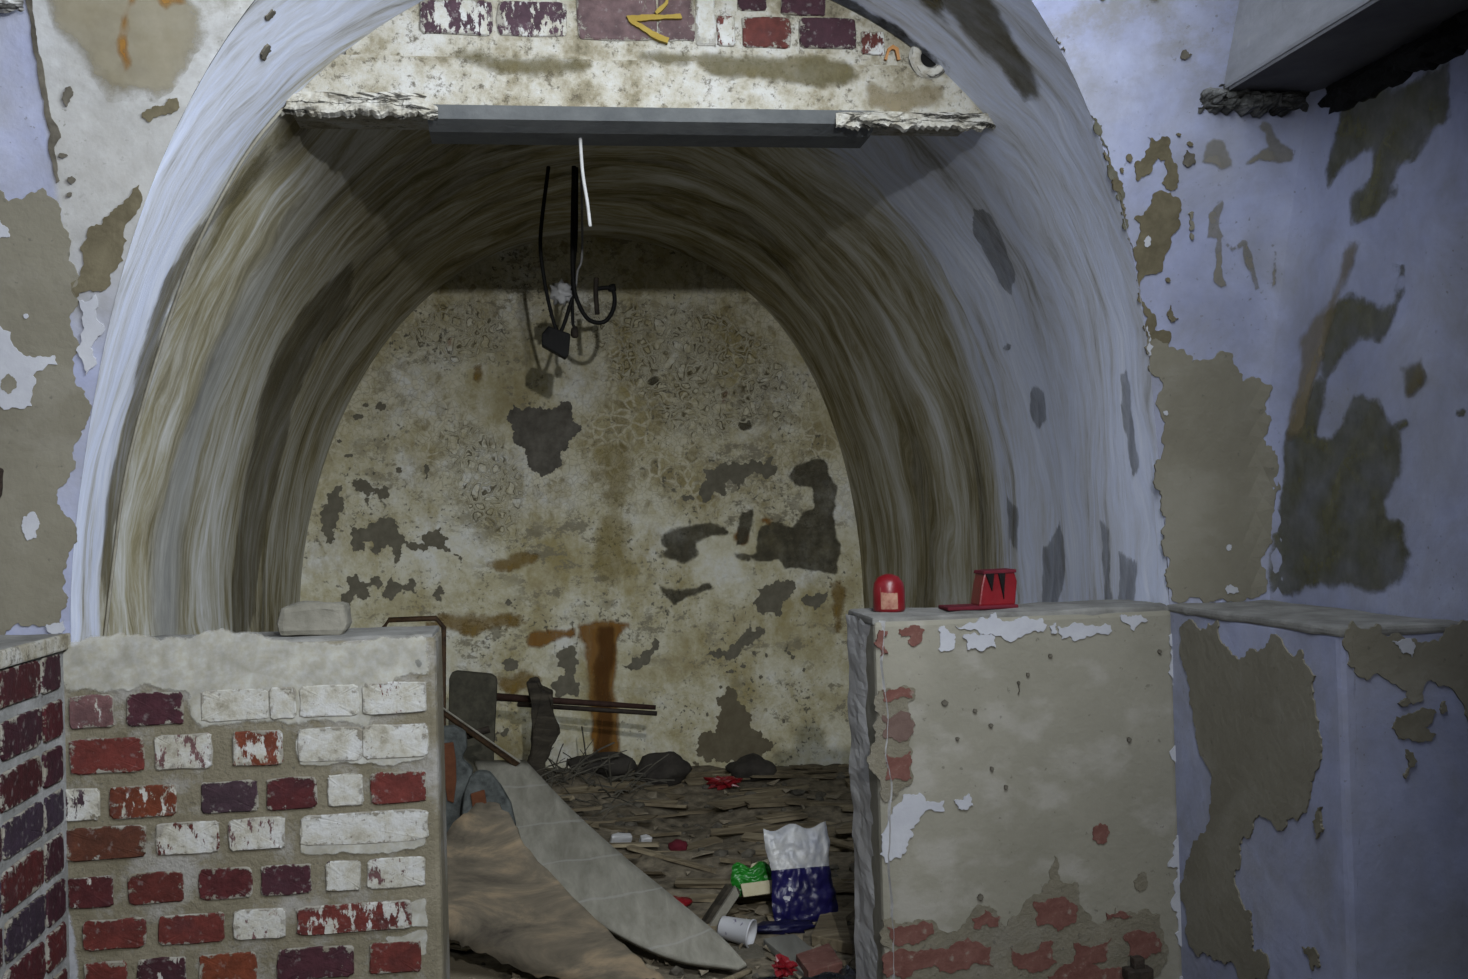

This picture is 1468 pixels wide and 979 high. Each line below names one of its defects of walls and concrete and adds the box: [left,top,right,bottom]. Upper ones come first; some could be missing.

corrosion [118,19,129,63]
spalling [1198,10,1468,118]
peeling [0,185,143,635]
spalling [506,401,582,477]
peeling [320,467,462,605]
peeling [1091,115,1325,979]
corrosion [426,613,629,753]
peeling [550,645,580,698]
peeling [693,579,828,766]
spalling [866,685,916,802]
peeling [1342,620,1468,779]
spalling [879,856,1169,979]